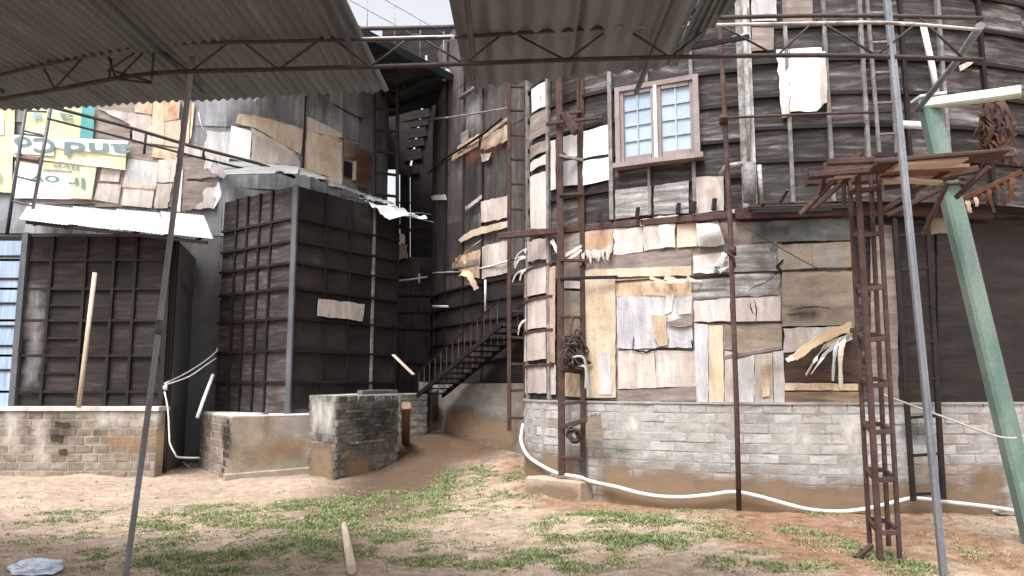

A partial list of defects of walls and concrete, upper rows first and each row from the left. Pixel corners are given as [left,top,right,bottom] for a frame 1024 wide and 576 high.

peeling [550,239,612,266]
crack [617,260,784,353]
peeling [785,322,855,389]